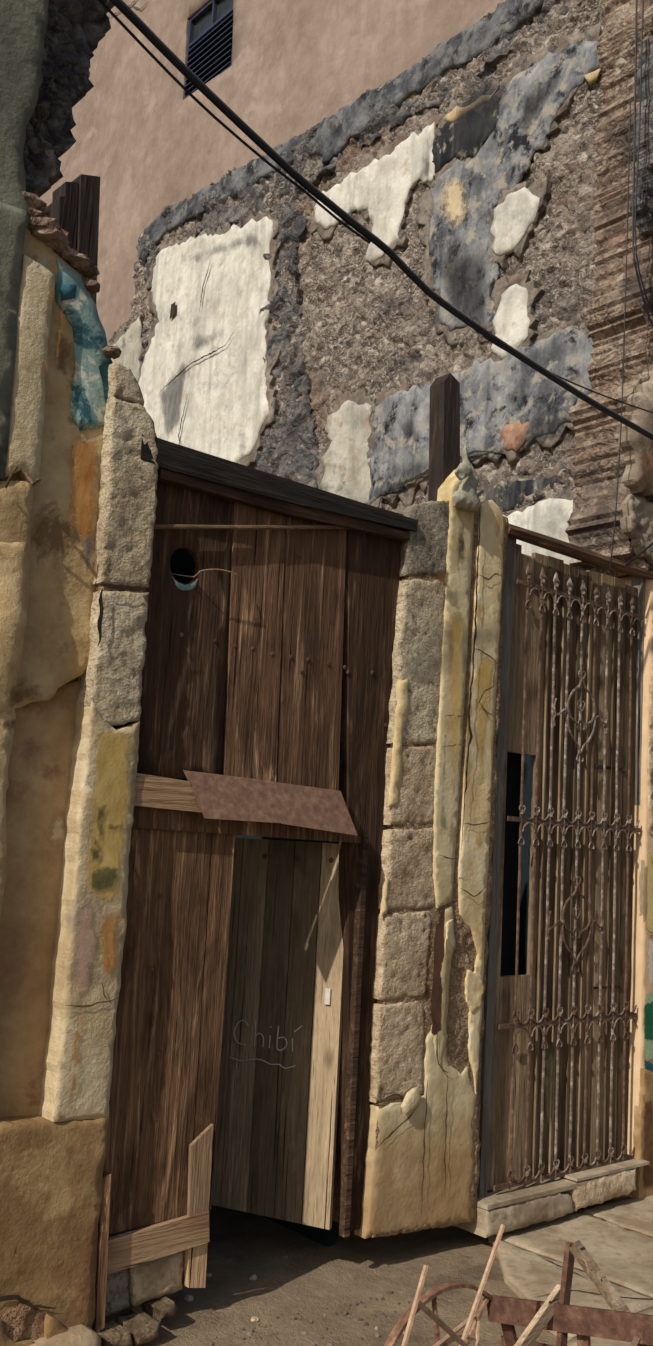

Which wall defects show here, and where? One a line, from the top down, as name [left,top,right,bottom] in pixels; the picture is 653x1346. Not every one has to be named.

peeling [55,209,284,468]
peeling [309,22,602,565]
spalling [444,907,484,1066]